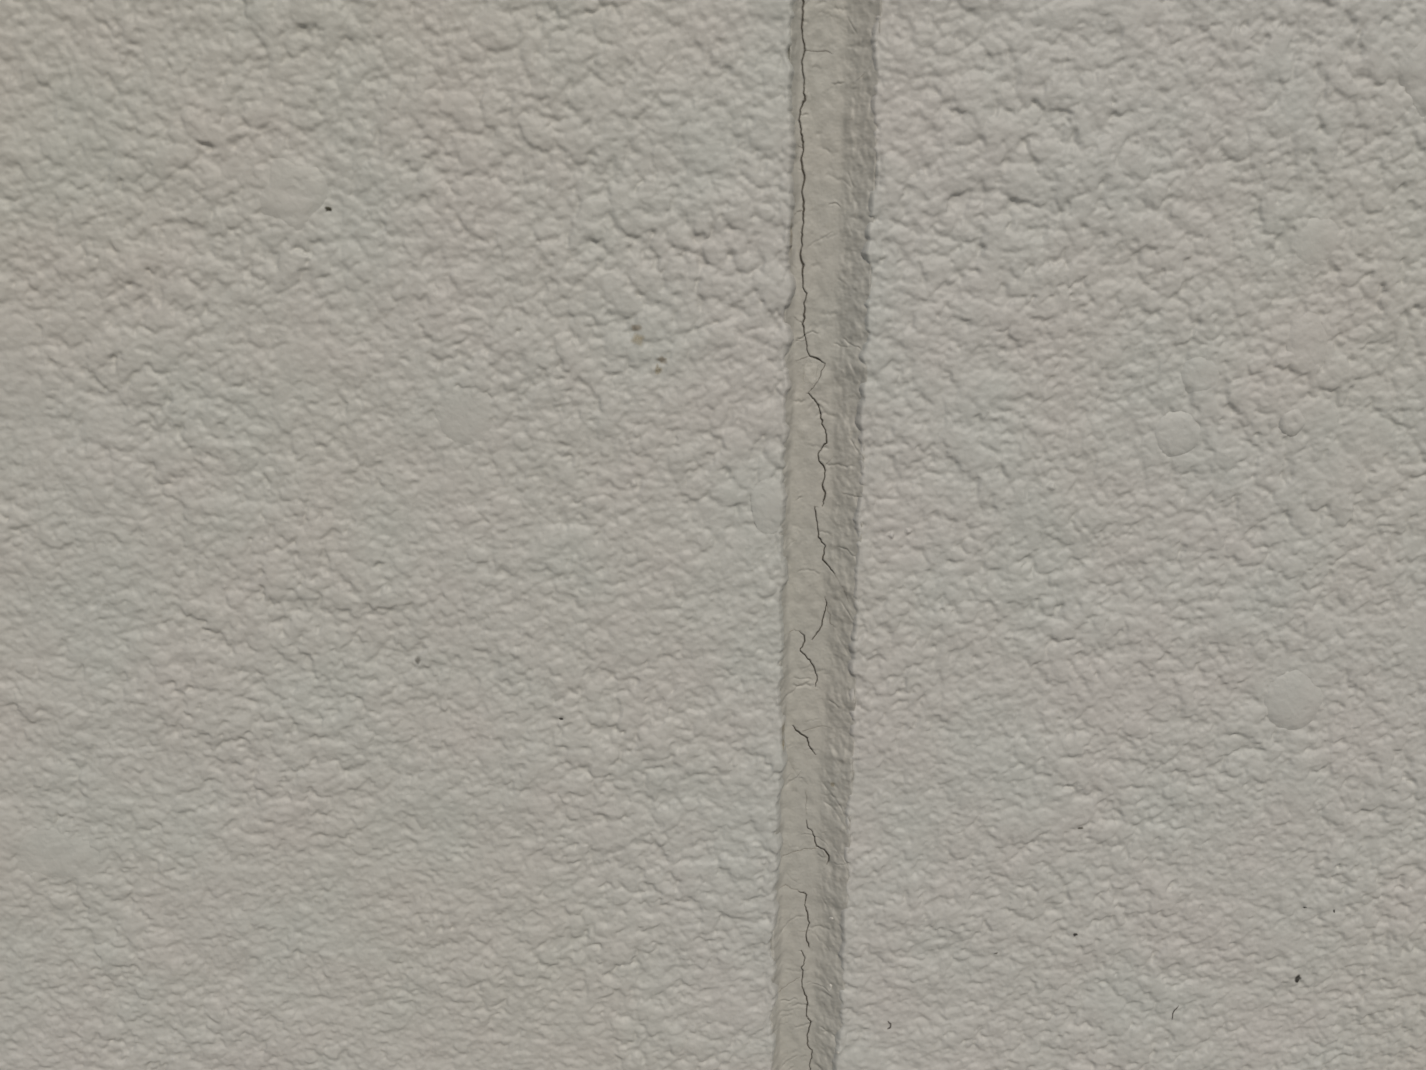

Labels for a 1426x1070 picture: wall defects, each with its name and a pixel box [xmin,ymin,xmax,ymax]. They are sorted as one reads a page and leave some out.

crack [795,0,849,682]
crack [778,791,829,1070]